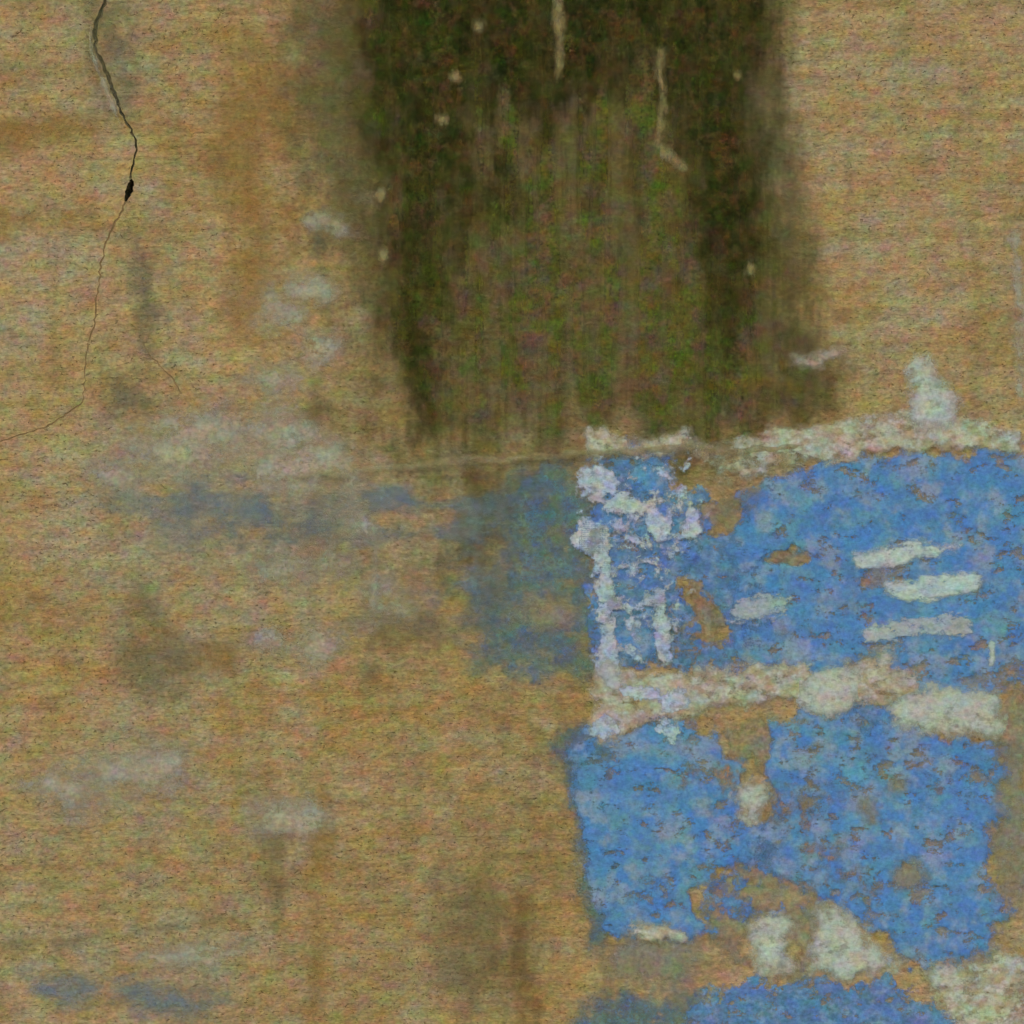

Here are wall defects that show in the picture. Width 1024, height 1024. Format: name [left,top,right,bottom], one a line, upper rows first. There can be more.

crack [0,0,138,442]
damp [263,276,332,325]
damp [304,212,347,235]
damp [362,0,769,340]
damp [796,348,840,367]
peeling [552,441,1024,1024]